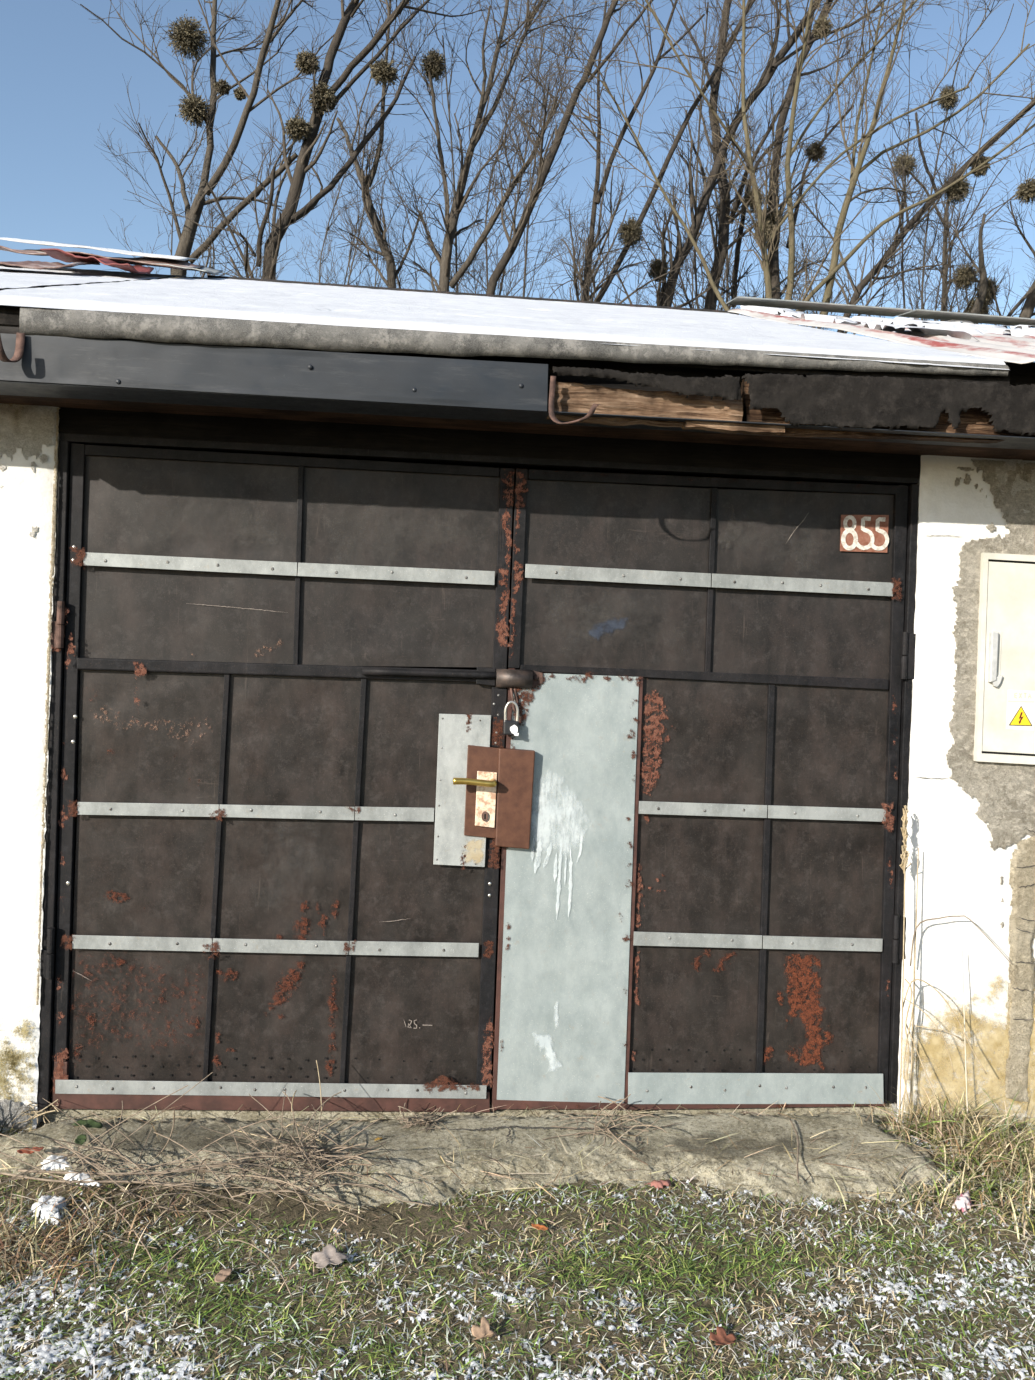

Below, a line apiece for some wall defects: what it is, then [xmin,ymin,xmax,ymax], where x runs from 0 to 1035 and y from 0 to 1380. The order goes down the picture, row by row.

corrosion [496,469,528,658]
peeling [0,404,60,1005]
corrosion [490,672,673,796]
spalling [946,459,1035,850]
corrosion [277,900,339,940]
leakage [0,1019,36,1102]
corrosion [423,1020,504,1093]
corrosion [763,954,834,1070]
leakage [901,976,1035,1125]